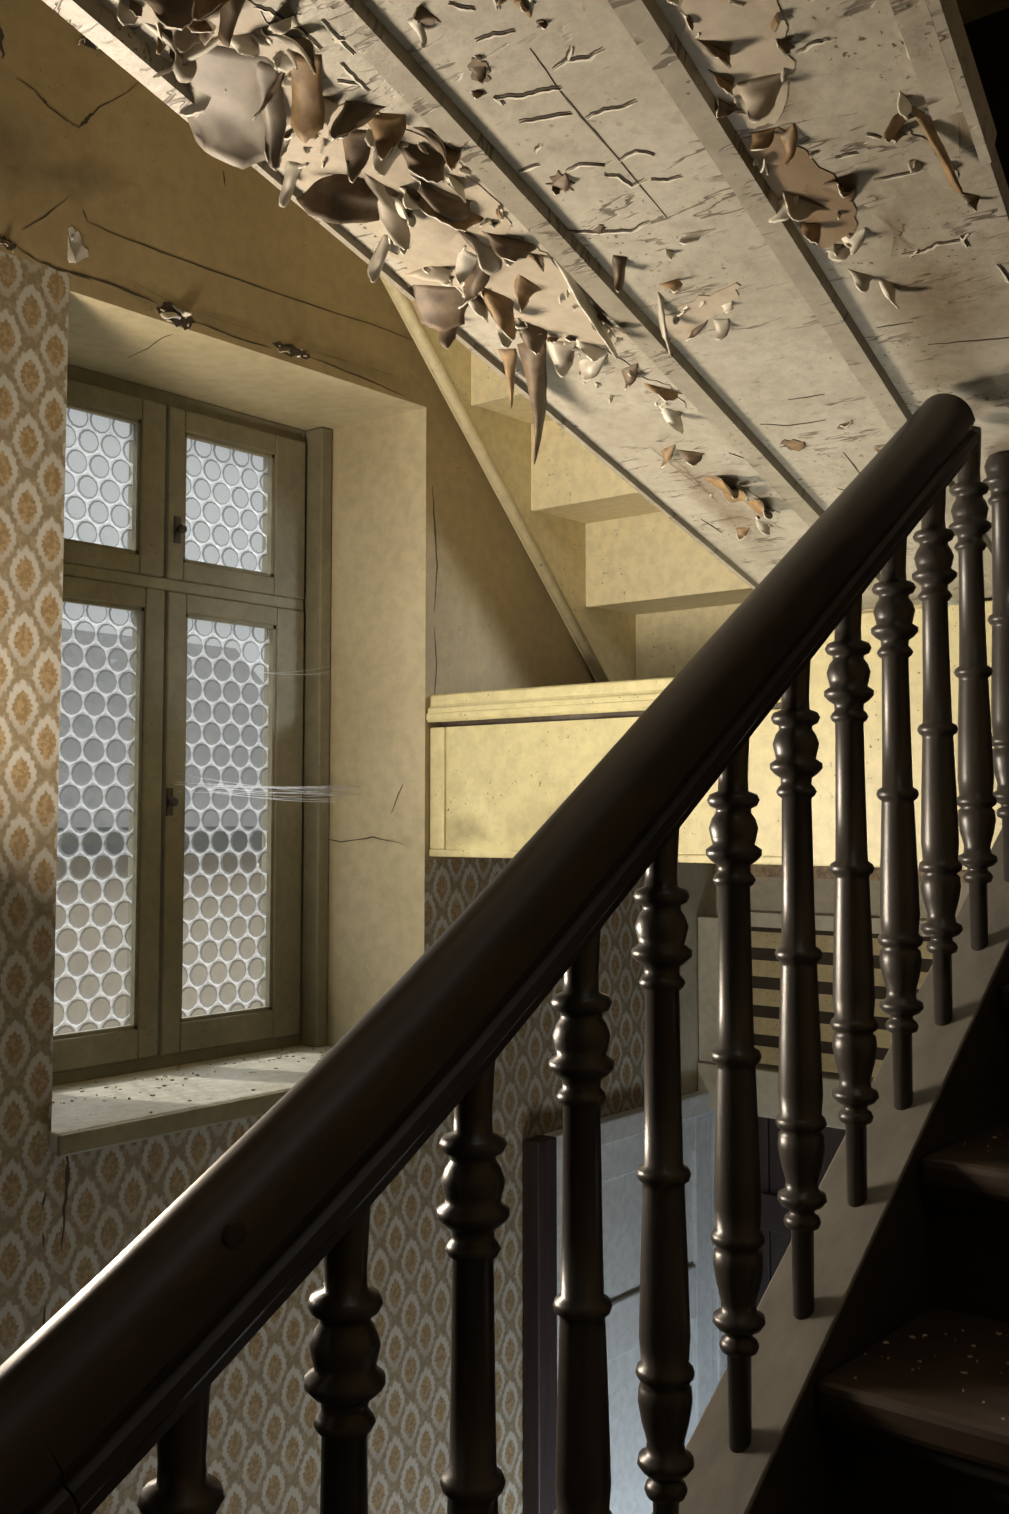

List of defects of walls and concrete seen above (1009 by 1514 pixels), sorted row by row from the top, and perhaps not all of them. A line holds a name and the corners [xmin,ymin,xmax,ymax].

crack [796,37,831,55]
crack [0,23,139,129]
crack [448,0,683,235]
peeling [667,0,899,309]
crack [835,132,924,182]
peeling [117,0,780,540]
crack [901,232,1009,283]
crack [876,322,1009,345]
peeling [781,439,806,452]